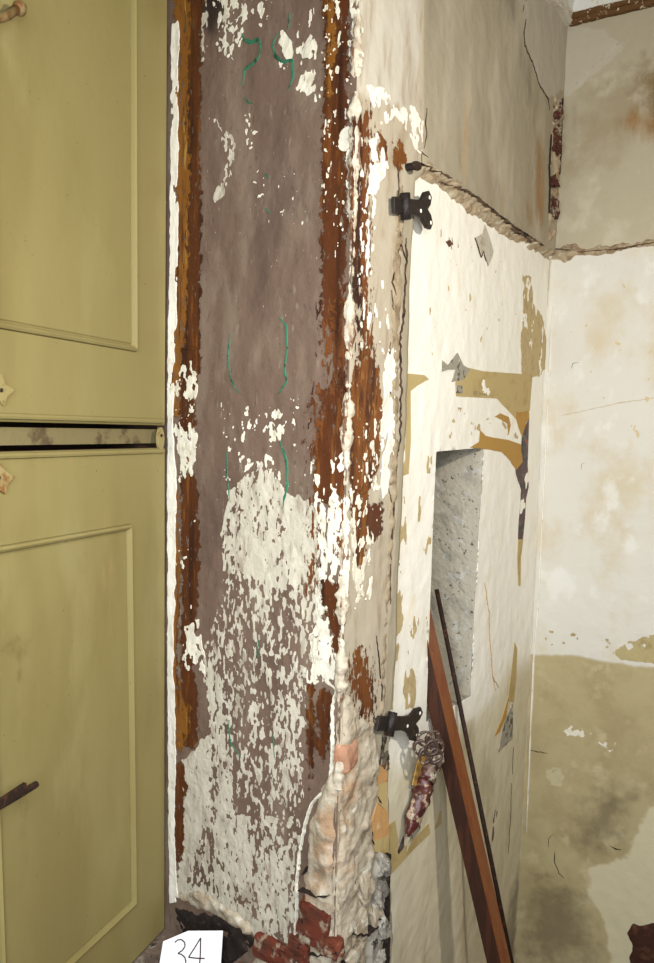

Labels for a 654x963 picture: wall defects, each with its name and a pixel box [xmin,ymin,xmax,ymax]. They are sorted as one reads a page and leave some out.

rust [167,0,206,865]
rust [301,0,407,722]
peeling [167,0,654,963]
crack [523,6,550,110]